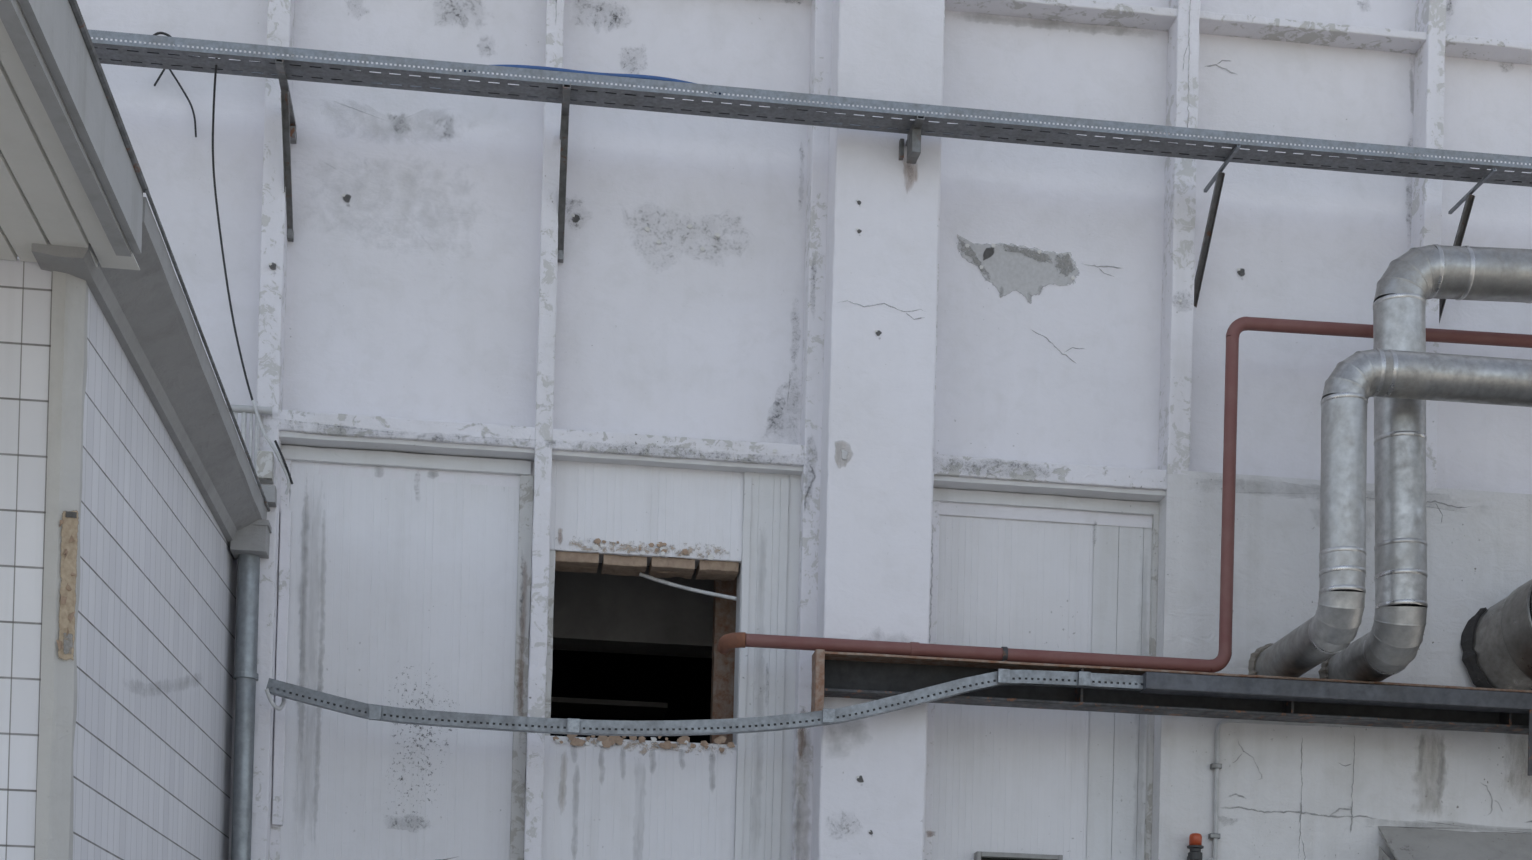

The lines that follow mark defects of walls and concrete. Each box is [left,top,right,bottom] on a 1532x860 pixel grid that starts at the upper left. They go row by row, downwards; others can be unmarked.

flaking render [957,235,1079,303]
flaking render [56,510,79,660]
spalling [560,537,729,560]
crack [1234,744,1367,855]